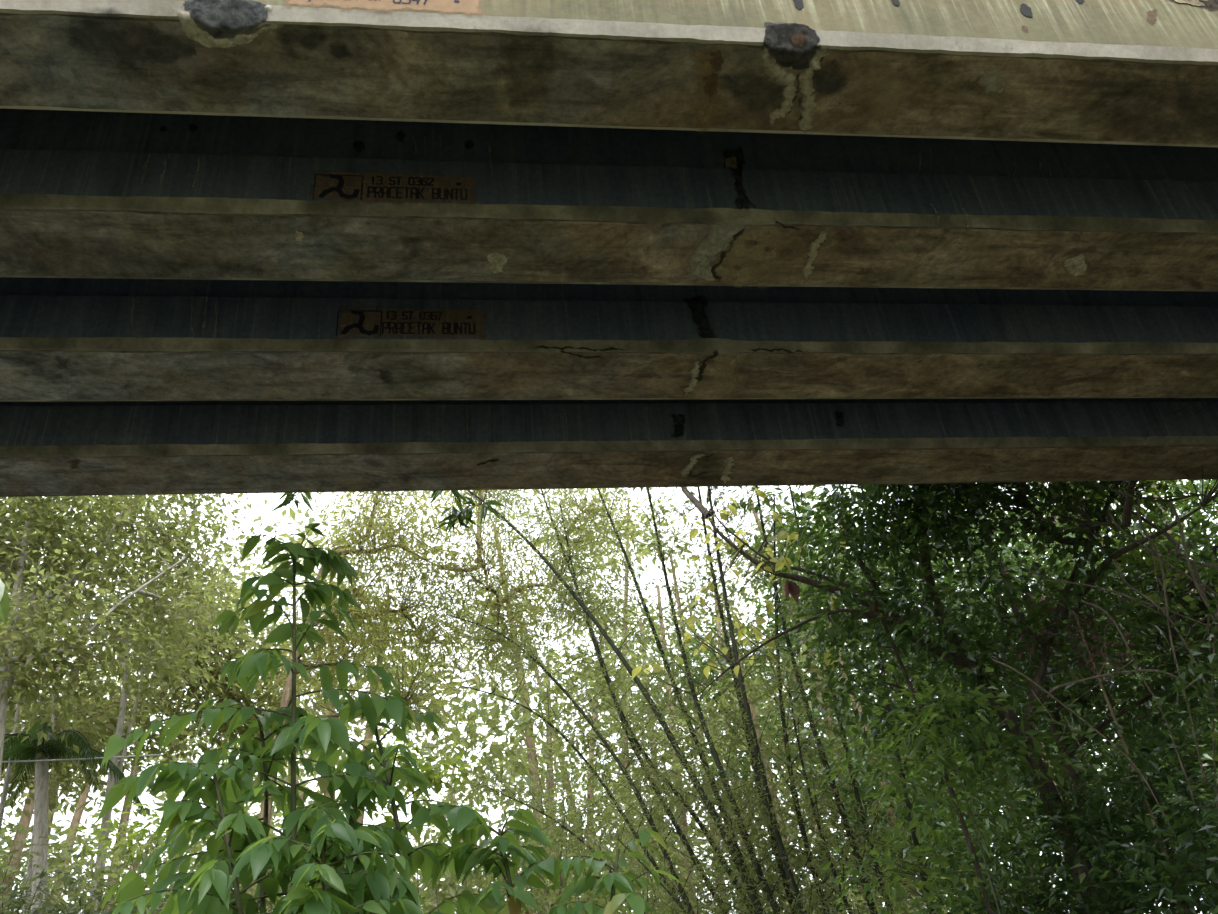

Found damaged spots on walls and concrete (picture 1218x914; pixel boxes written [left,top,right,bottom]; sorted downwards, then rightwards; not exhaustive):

spalling [176,0,281,48]
crack [711,229,752,280]
crack [536,345,625,359]
crack [697,350,718,382]
crack [750,346,803,354]